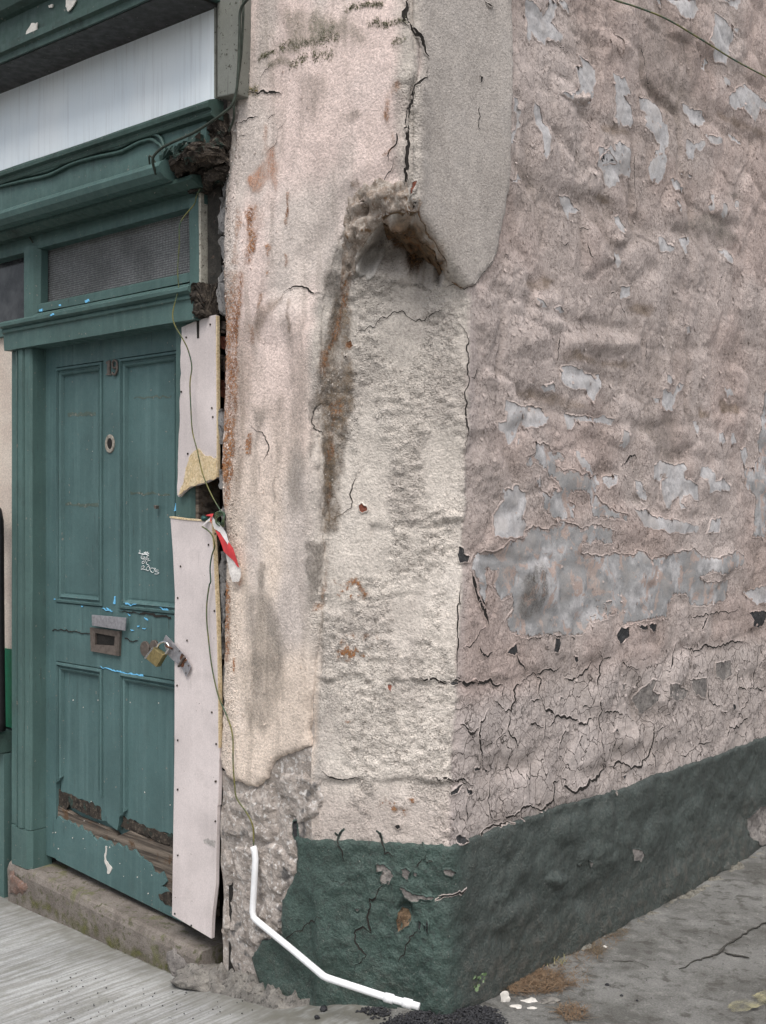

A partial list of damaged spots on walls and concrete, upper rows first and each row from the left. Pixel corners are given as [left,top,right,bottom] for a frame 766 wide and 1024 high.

crack [384,0,430,184]
spalling [219,101,273,758]
peeling [310,0,766,847]
crack [417,571,766,836]
spalling [375,862,436,936]
crack [679,922,766,969]